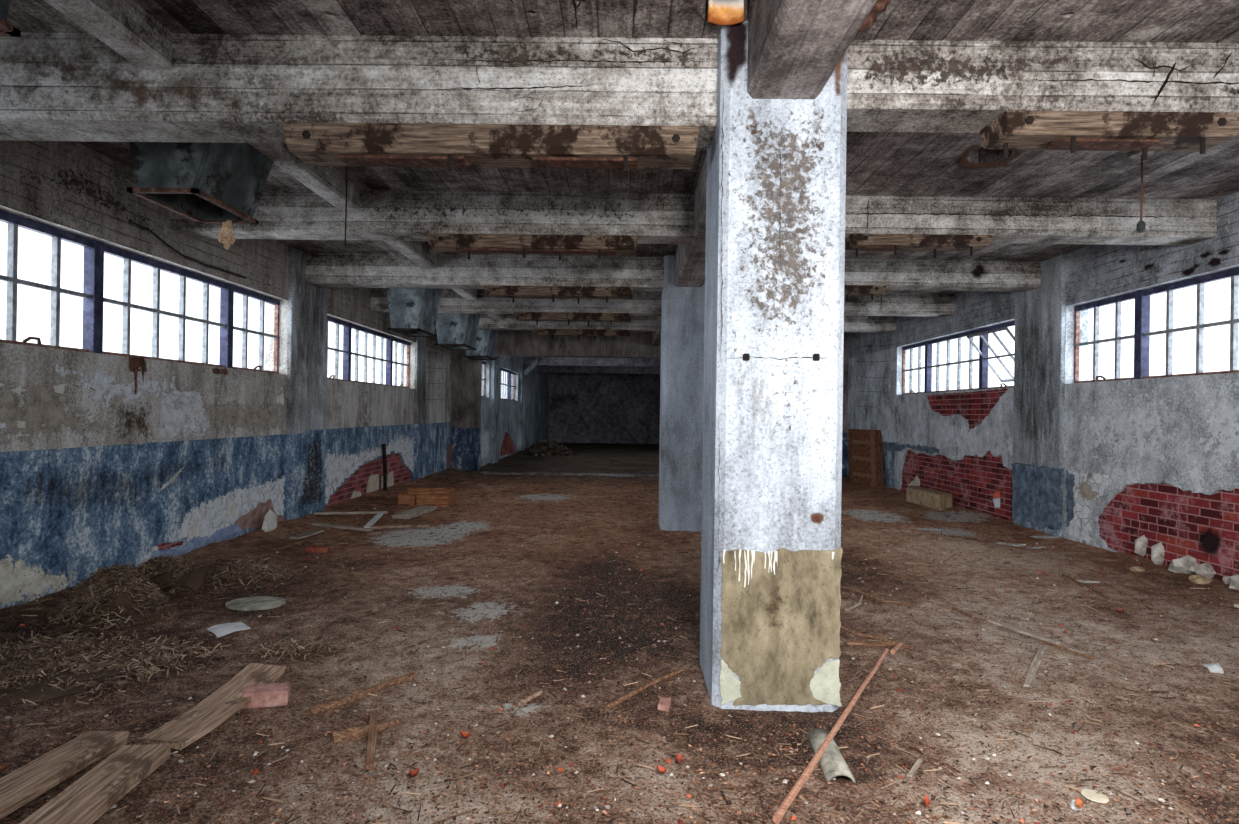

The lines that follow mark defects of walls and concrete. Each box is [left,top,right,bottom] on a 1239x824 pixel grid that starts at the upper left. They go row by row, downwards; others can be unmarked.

leakage [732,104,834,336]
corrosion [129,356,147,393]
corrosion [119,406,151,435]
flaking render [325,436,414,507]
flaking render [883,385,1239,582]
corrosion [811,513,824,524]
leakage [767,587,782,625]
leakage [719,659,742,705]
leakage [810,659,842,707]